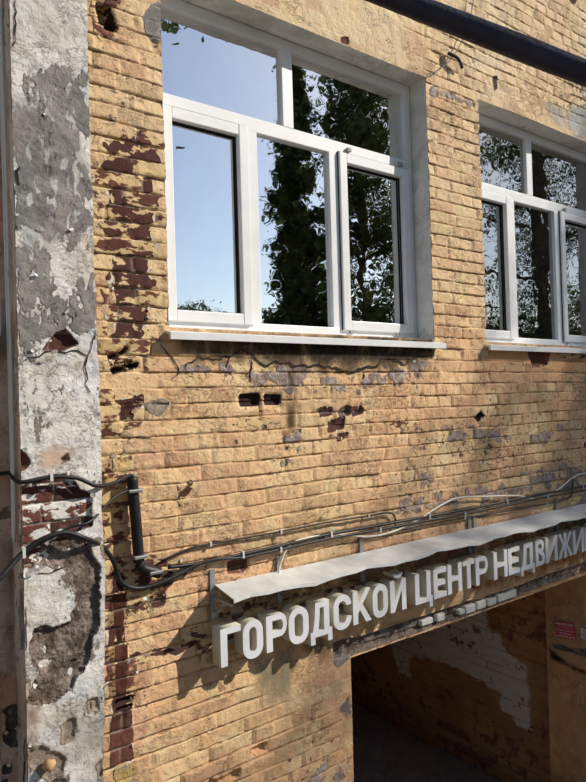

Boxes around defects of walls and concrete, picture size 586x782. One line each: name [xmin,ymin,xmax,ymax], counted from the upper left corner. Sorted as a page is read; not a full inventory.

crack [11,0,19,46]
flaking render [89,0,121,41]
peeling [143,1,163,46]
flaking render [12,62,169,371]
peeling [179,362,235,379]
peeling [238,360,430,407]
flaking render [99,389,171,438]
flaking render [19,447,31,471]
flaking render [0,507,11,520]
flaking render [17,452,213,782]
peeling [1,704,79,782]